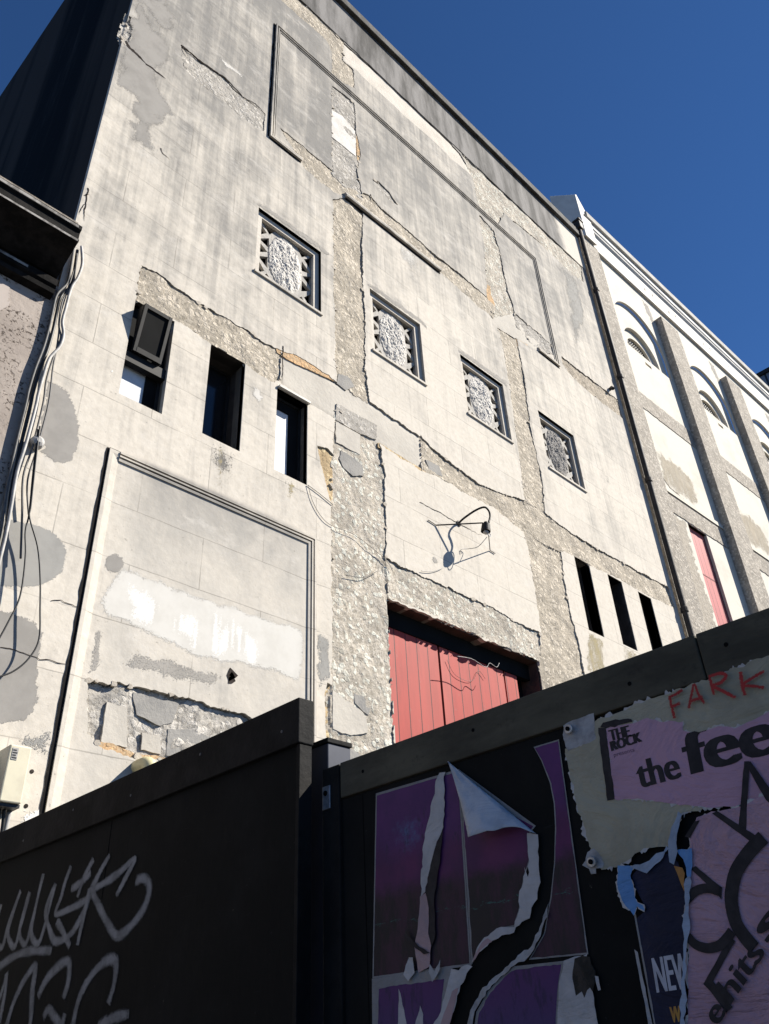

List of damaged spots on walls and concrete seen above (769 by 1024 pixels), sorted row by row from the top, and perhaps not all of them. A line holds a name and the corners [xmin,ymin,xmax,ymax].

spalling [181,46,265,131]
spalling [135,267,280,382]
spalling [282,0,674,608]
damp [40,381,80,463]
damp [0,519,66,587]
damp [0,611,44,724]
spalling [84,677,248,760]